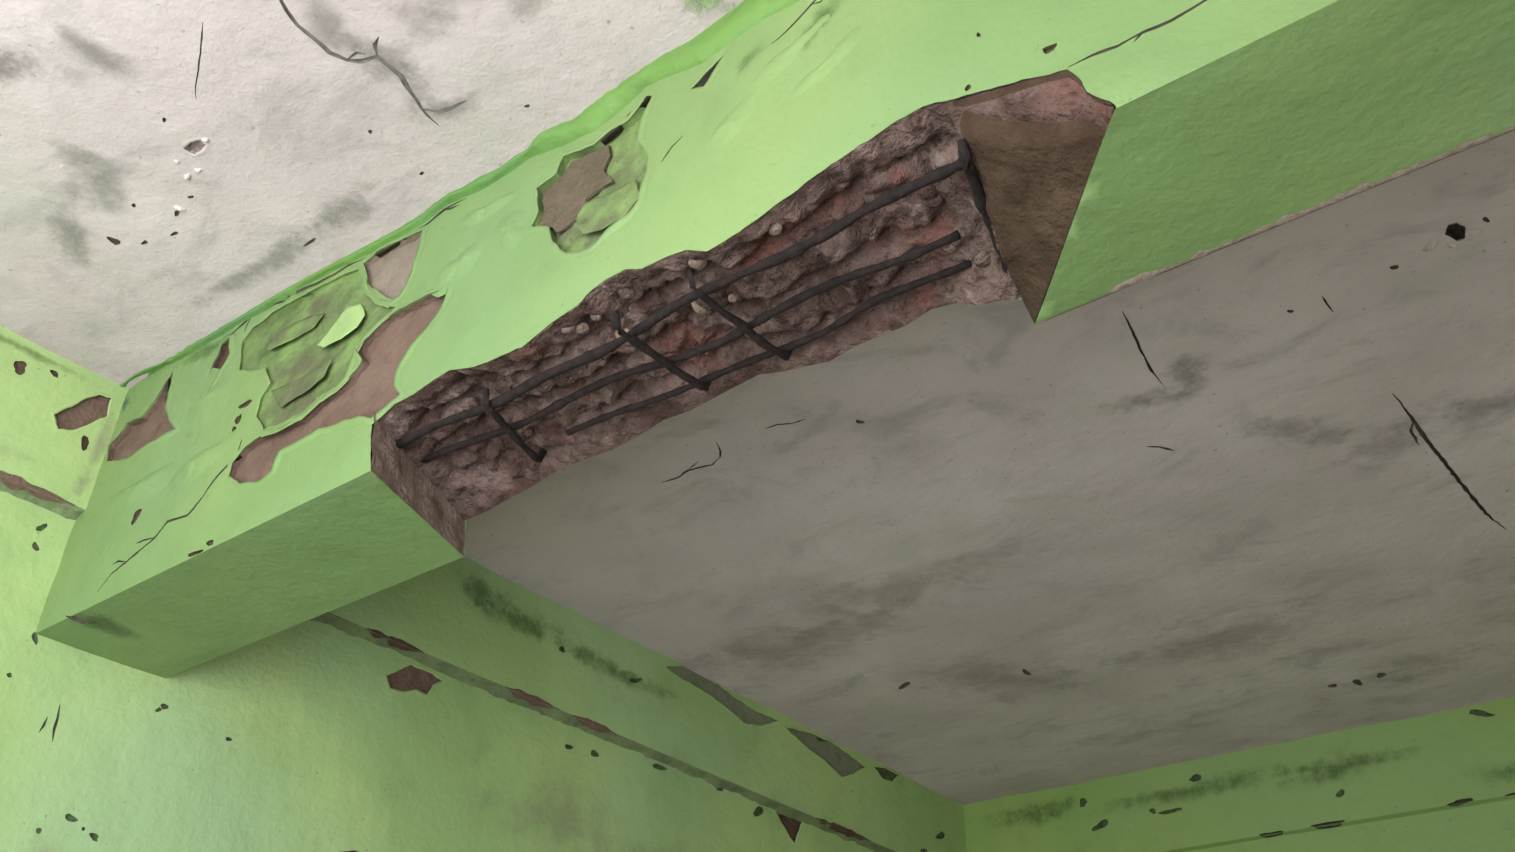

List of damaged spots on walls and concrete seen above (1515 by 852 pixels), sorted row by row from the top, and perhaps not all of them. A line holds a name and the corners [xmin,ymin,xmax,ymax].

crack [279,0,466,126]
crack [1069,0,1207,67]
spalling [14,361,27,375]
peeling [50,365,199,466]
spalling [205,69,1515,556]
crack [1393,394,1505,529]
crack [66,438,243,624]
flaking render [1328,673,1386,688]